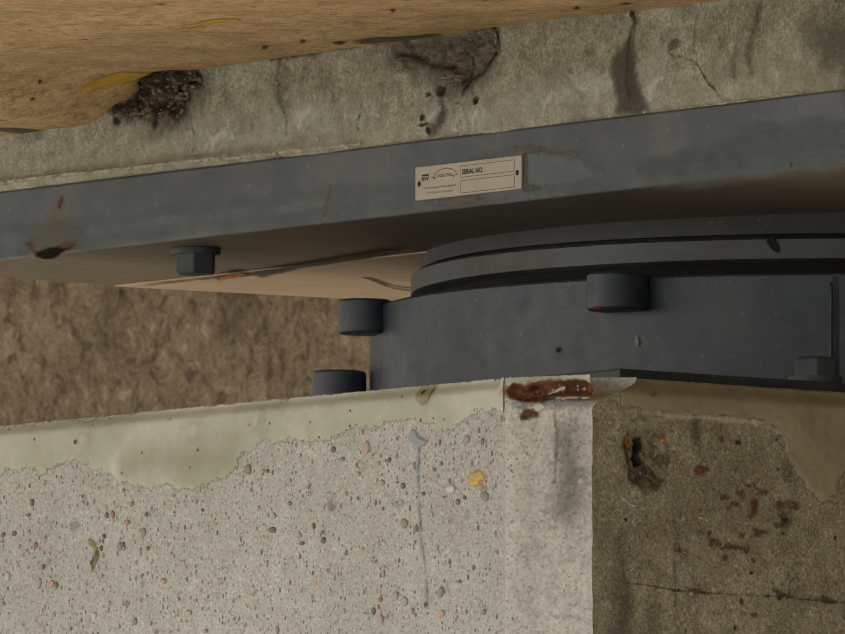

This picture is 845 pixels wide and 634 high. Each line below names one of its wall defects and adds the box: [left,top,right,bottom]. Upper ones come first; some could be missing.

spalling [108,70,203,129]
spalling [392,27,500,96]
damp [419,43,672,136]
crack [668,39,719,96]
corrosion [26,221,75,259]
peeling [0,374,595,492]
peeling [620,380,845,502]
crack [629,576,844,603]